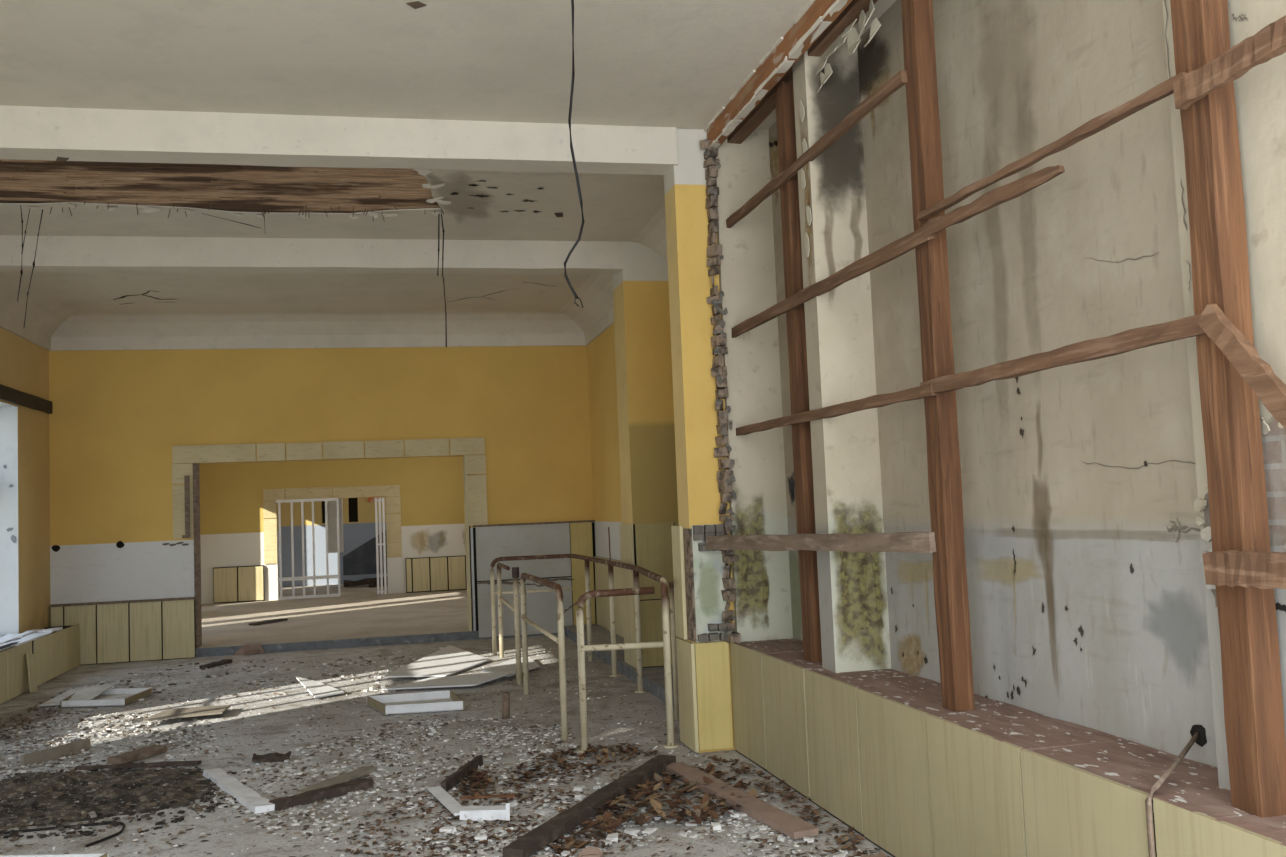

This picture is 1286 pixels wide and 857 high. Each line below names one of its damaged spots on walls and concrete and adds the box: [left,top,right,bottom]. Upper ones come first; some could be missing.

flaking render [0,157,451,222]
leakage [450,180,544,213]
spalling [683,139,741,643]
spalling [1260,417,1284,434]
leakage [734,499,769,621]
leakage [835,508,881,534]
spalling [1194,482,1212,563]
leakage [834,551,923,675]